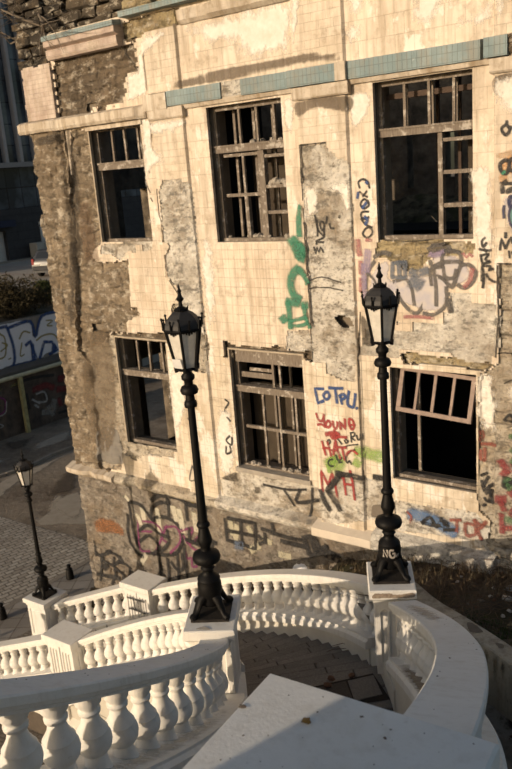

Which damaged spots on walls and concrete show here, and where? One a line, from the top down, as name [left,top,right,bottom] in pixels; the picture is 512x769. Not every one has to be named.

spalling [7,0,179,117]
water stain [177,53,334,87]
spalling [70,129,176,470]
peeling [159,179,210,372]
peeling [221,143,512,566]